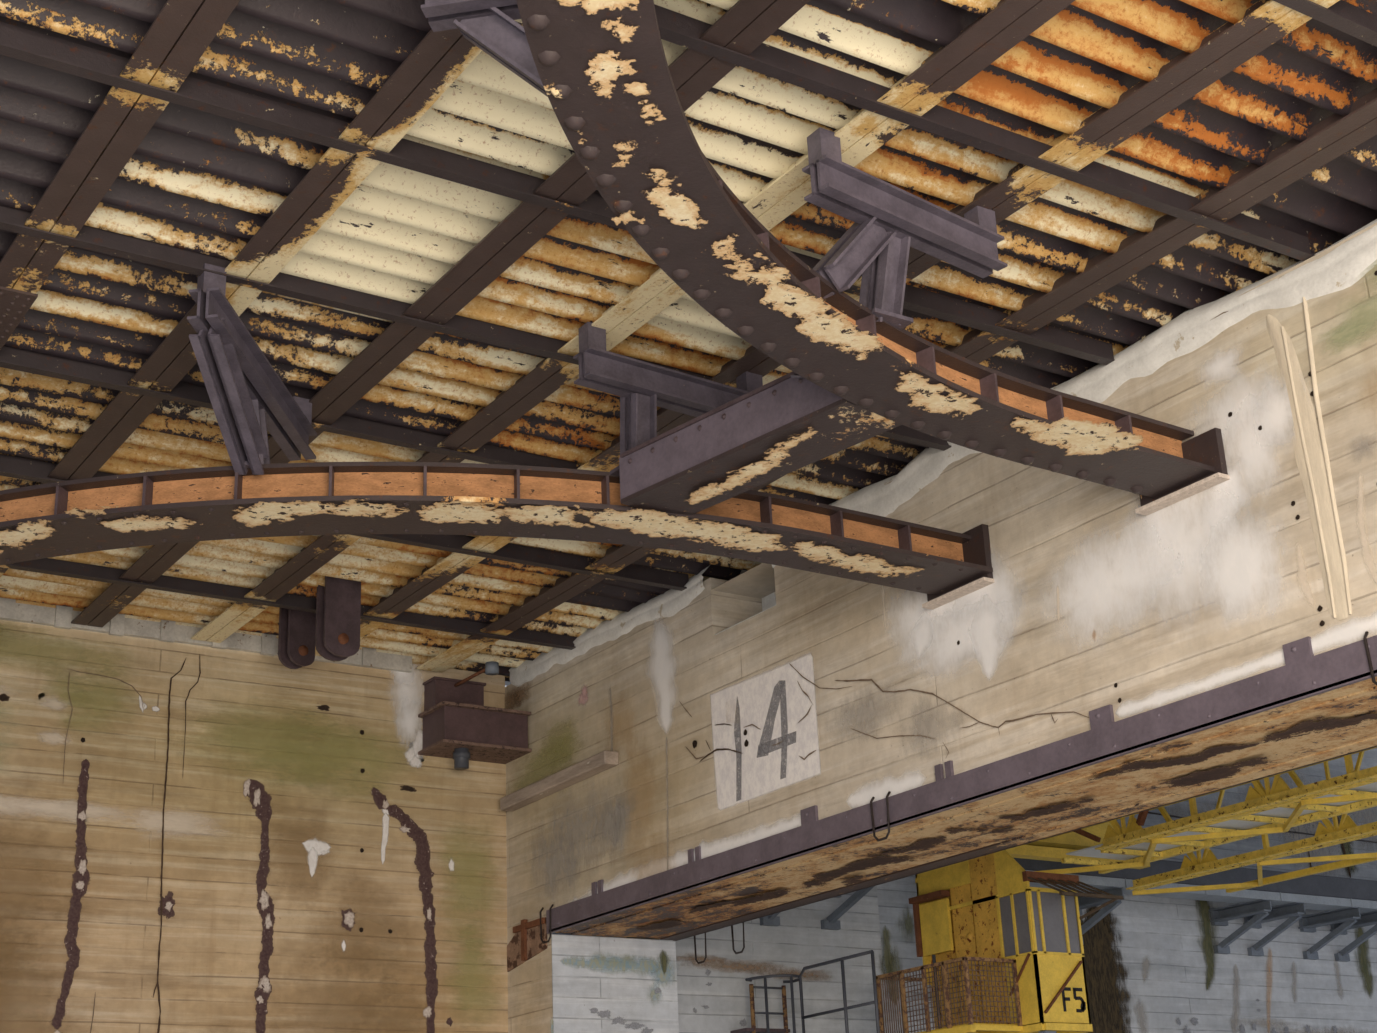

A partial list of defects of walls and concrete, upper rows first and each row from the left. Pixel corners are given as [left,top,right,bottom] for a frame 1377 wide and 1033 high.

damp [1057,297,1377,652]
damp [882,560,1014,678]
damp [651,627,674,732]
crack [679,663,1089,761]
damp [1117,650,1285,716]
damp [847,773,924,807]
crack [63,655,201,1033]
damp [574,816,801,901]
damp [1341,841,1356,872]
damp [1080,906,1131,1033]